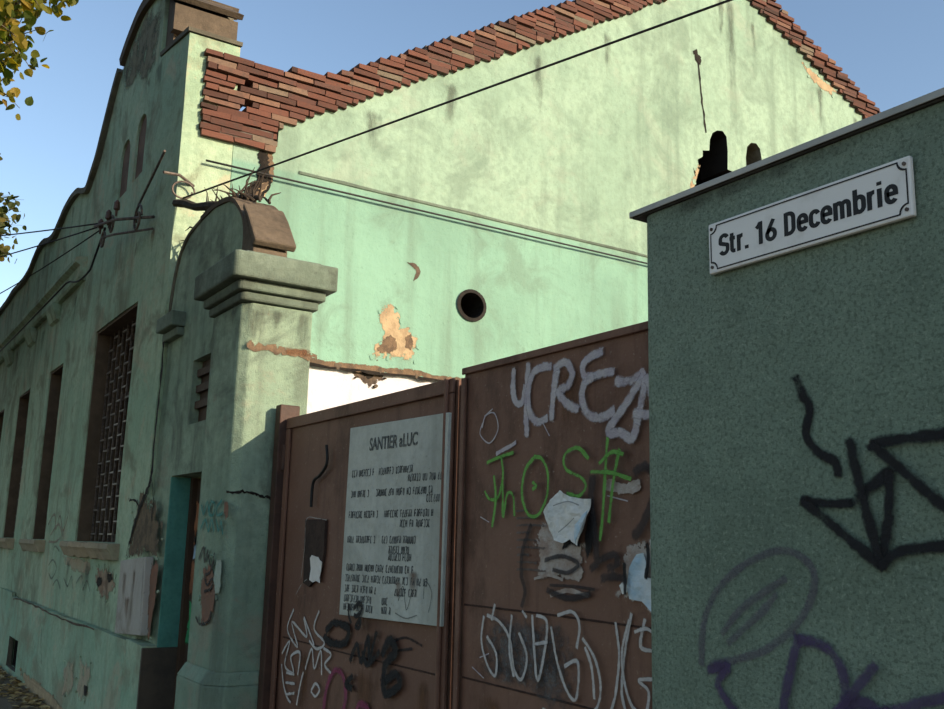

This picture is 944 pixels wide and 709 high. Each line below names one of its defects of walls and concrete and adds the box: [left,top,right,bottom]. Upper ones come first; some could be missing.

crack [248,128,274,197]
flaking render [247,304,462,389]
crack [226,489,270,500]